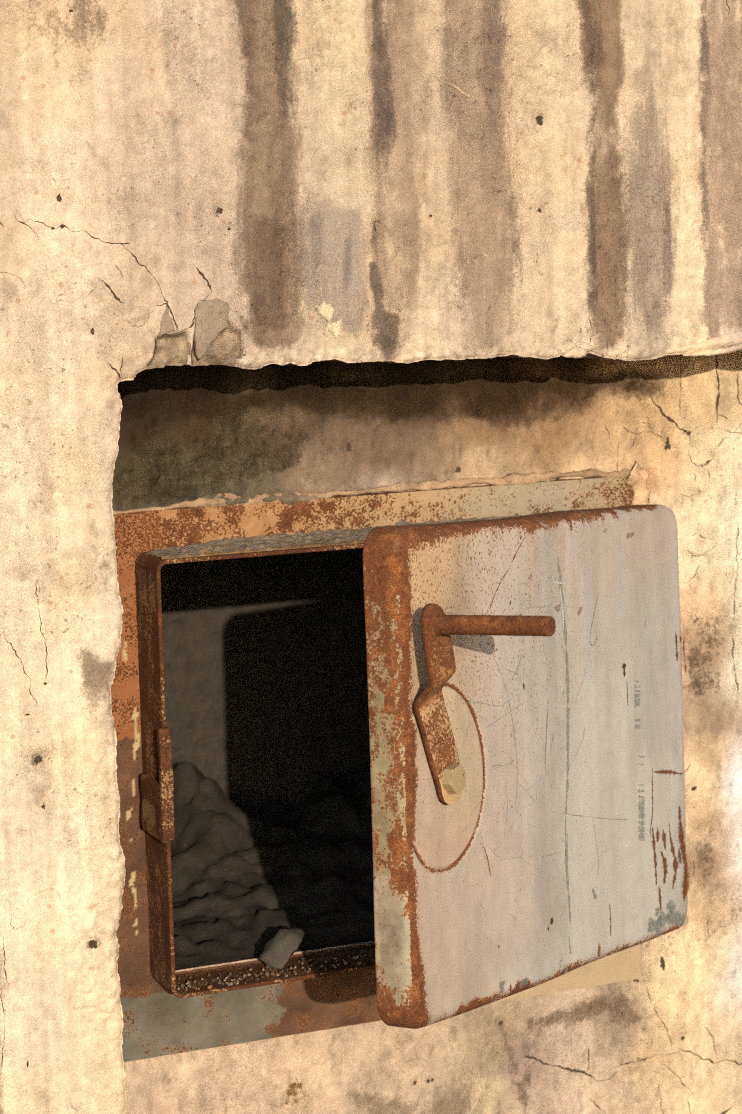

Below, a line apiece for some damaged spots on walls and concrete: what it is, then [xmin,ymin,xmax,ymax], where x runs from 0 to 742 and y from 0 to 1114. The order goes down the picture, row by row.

water stain [236,0,422,359]
water stain [579,0,677,348]
water stain [698,0,742,339]
crack [0,217,212,337]
flaking render [148,299,246,369]
crack [605,355,742,497]
crack [684,524,739,689]
corrosion [650,764,695,910]
crack [524,989,742,1114]